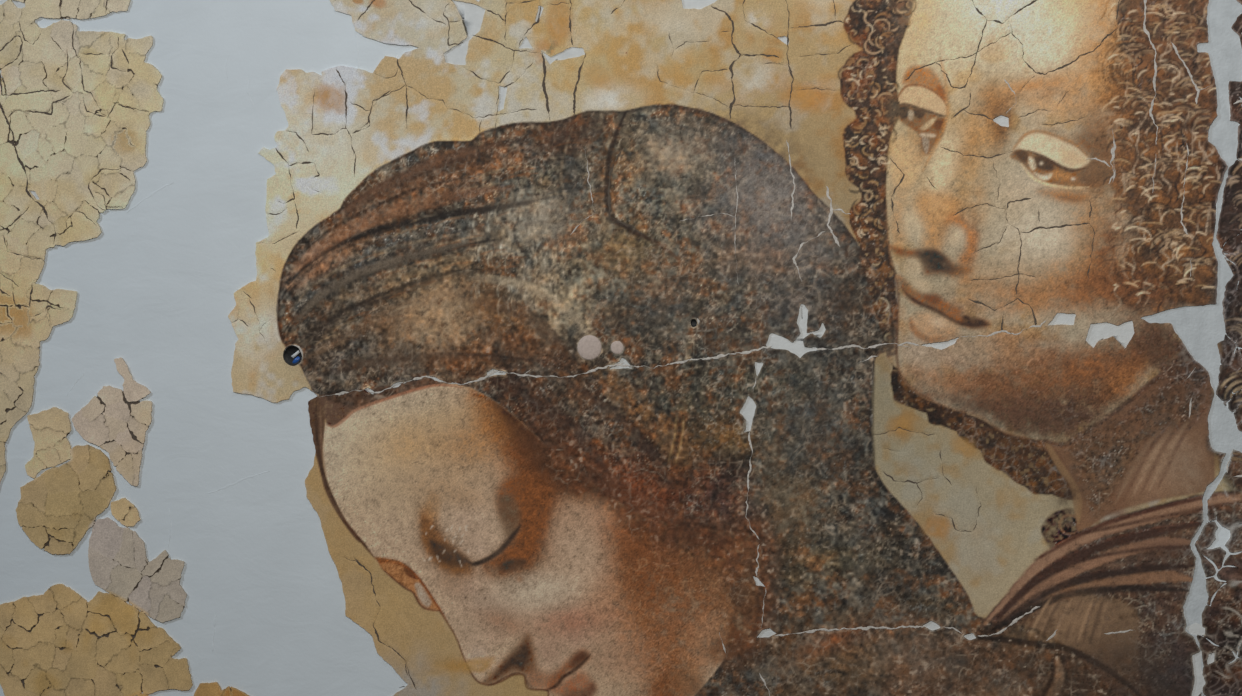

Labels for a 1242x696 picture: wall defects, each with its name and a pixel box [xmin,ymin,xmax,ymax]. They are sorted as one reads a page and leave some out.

peeling [682,0,717,9]
crack [0,0,158,443]
crack [5,556,184,696]
crack [78,391,149,490]
peeling [0,0,249,696]
crack [322,346,771,397]
crack [657,0,850,284]
crack [746,427,1058,640]
crack [941,130,1116,337]
peeling [1048,313,1076,325]
crack [906,0,1242,279]
peeling [1086,0,1242,696]